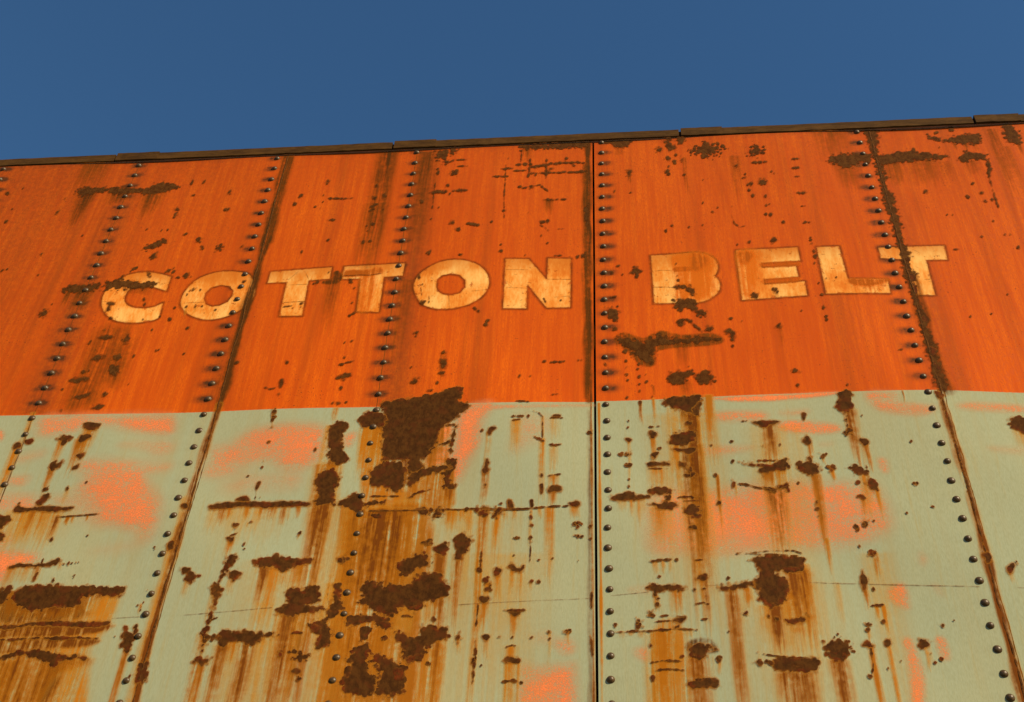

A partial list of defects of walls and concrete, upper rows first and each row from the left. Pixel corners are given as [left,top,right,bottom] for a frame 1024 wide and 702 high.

corrosion [0,153,303,702]
corrosion [188,136,902,702]
corrosion [826,124,1024,702]